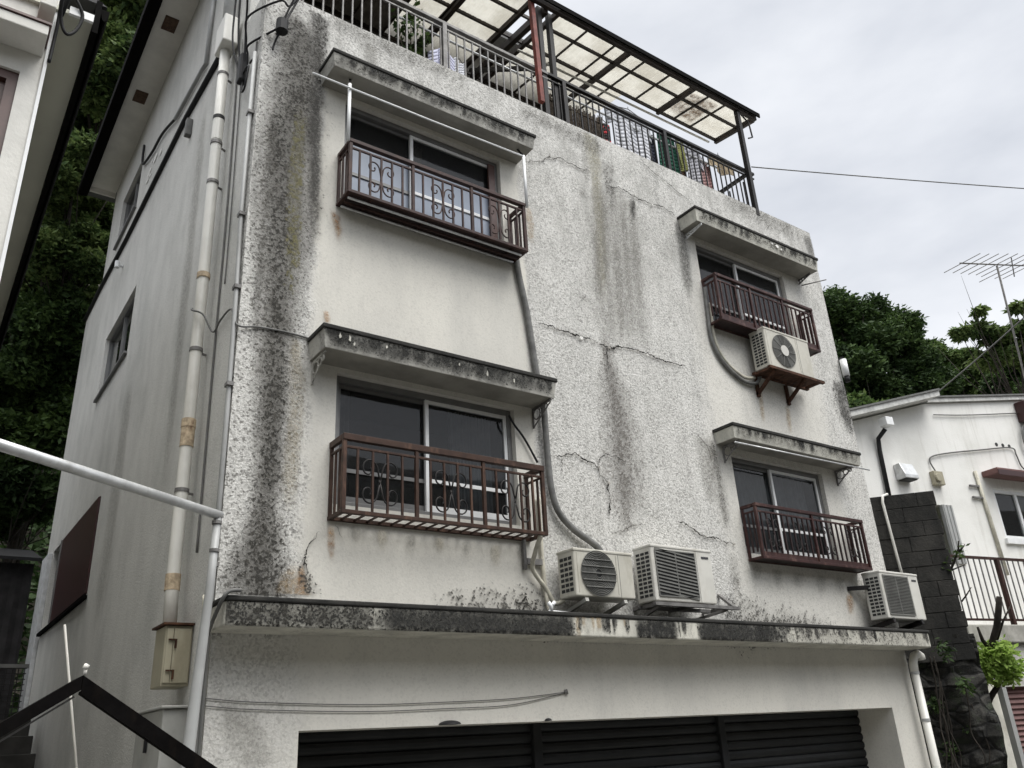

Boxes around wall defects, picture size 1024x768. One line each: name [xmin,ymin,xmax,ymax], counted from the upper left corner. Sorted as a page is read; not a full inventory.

crack [607,159,691,216]
water stain [677,224,690,286]
water stain [224,13,582,643]
crack [535,322,685,369]
crack [555,452,735,545]
water stain [601,554,929,656]